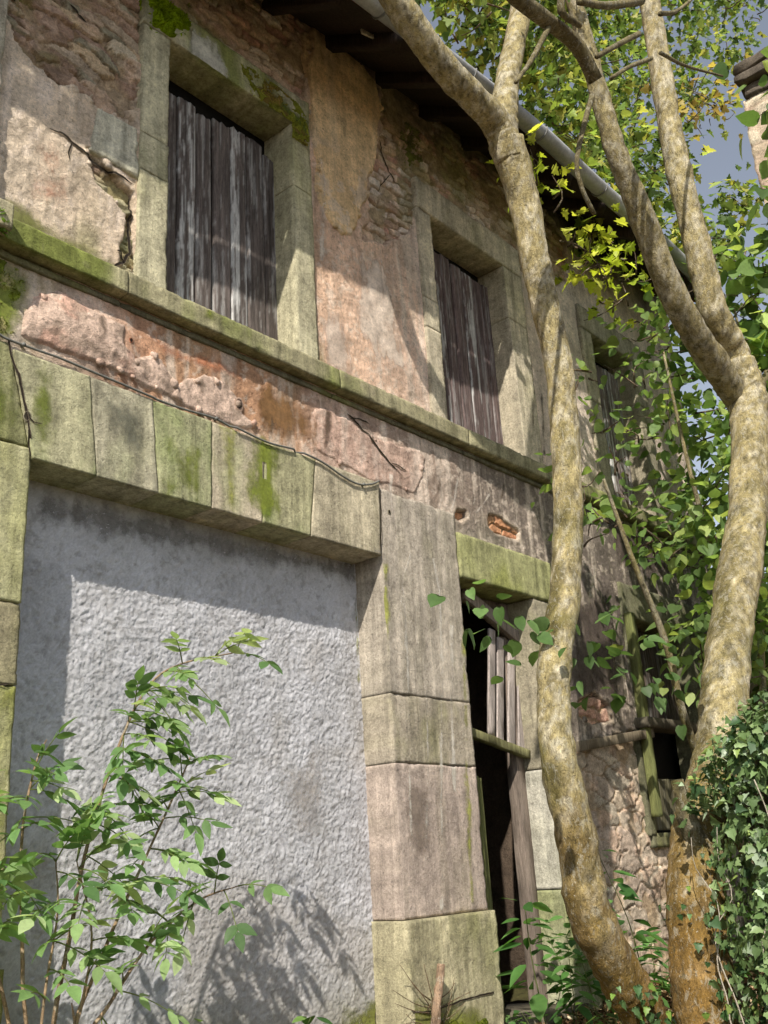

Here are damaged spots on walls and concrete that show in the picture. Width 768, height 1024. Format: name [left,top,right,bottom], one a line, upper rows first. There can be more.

spalling [7,0,142,118]
spalling [169,0,522,272]
crack [49,128,134,266]
spalling [83,148,134,274]
spalling [543,217,565,286]
water stain [112,408,139,447]
crack [348,414,408,473]
crack [377,492,385,549]
spalling [487,516,521,539]